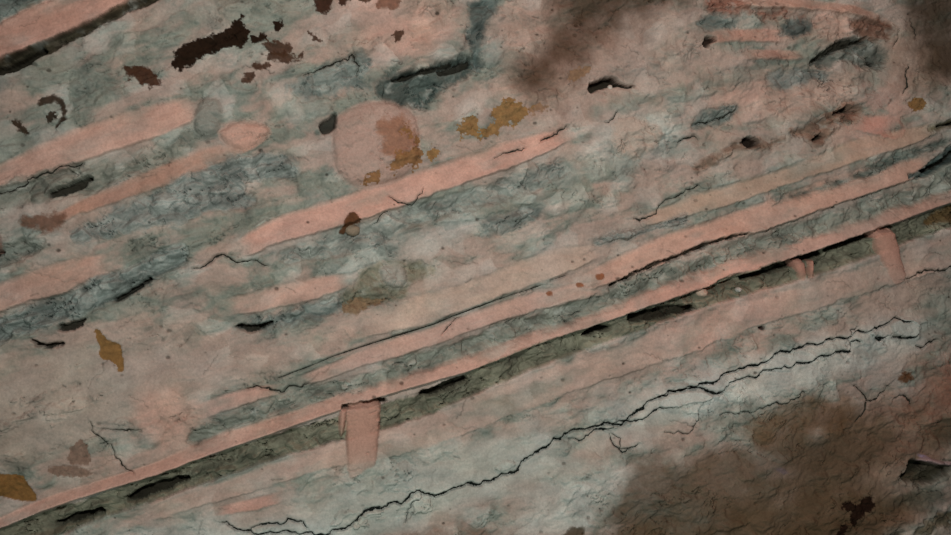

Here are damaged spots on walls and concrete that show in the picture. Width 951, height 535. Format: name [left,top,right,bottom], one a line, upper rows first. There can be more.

spalling [0,0,159,76]
rust [374,112,420,159]
peeling [456,97,549,142]
leakage [497,0,697,105]
spalling [691,99,865,175]
peeling [907,97,927,112]
crack [251,275,566,393]
spalling [0,119,951,535]
crack [226,317,935,535]
leakage [563,387,913,535]